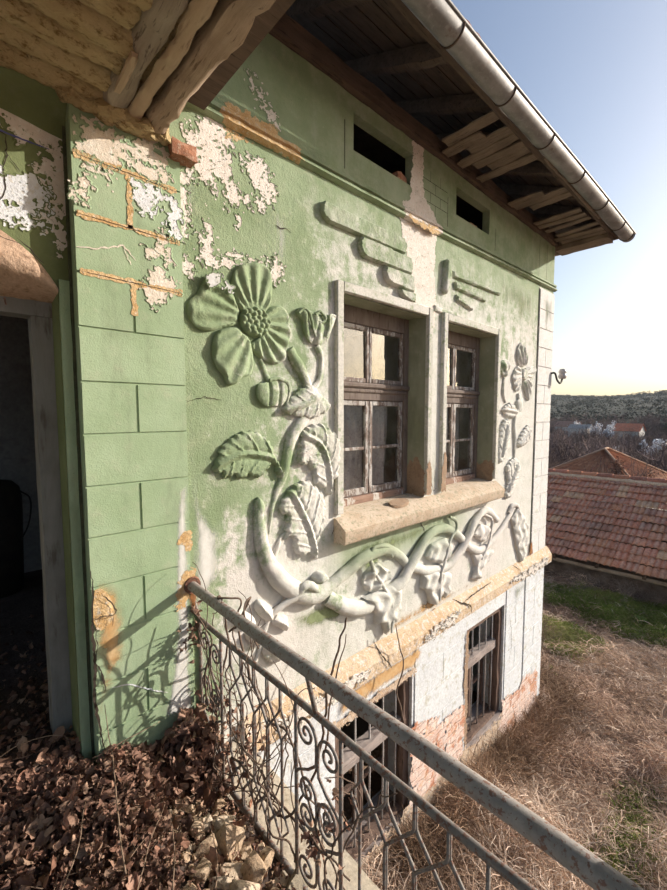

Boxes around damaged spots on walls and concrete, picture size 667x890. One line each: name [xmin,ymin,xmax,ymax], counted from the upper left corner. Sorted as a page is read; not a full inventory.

crack [0,131,20,200]
peeling [0,68,305,314]
spalling [399,141,443,328]
spalling [177,530,193,552]
spalling [174,567,196,612]
crack [452,584,488,612]
crack [90,571,168,750]
spalling [458,631,508,768]
spalling [362,776,451,873]